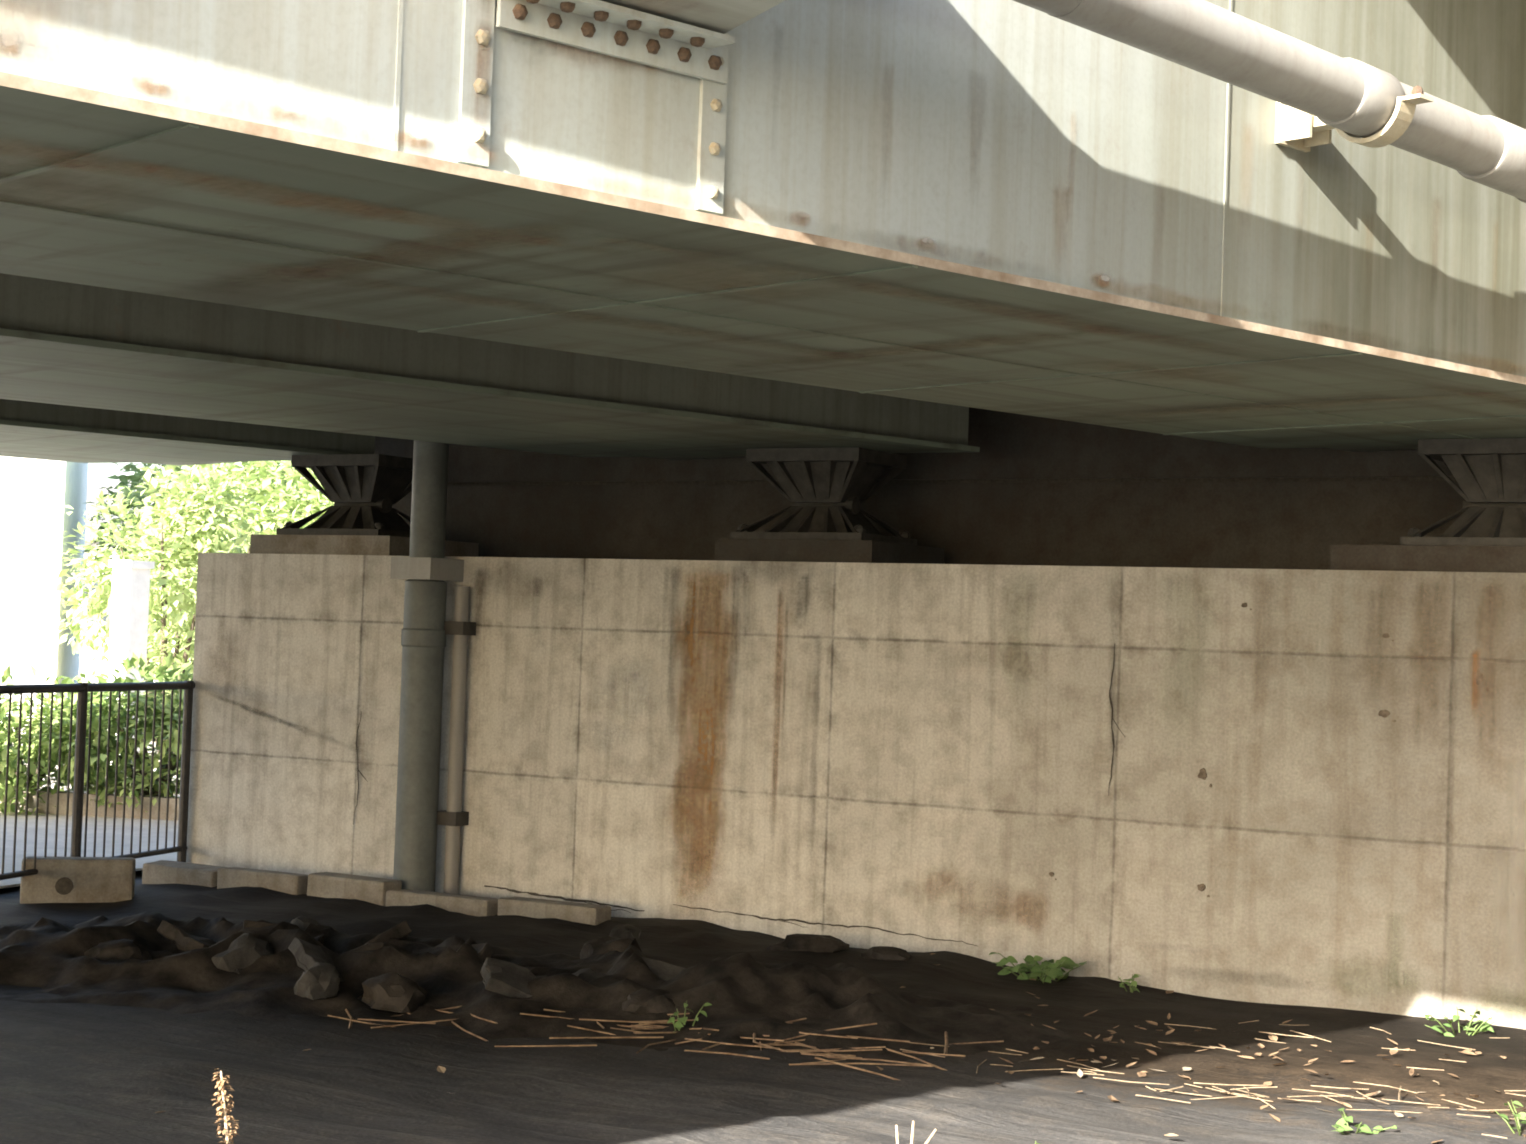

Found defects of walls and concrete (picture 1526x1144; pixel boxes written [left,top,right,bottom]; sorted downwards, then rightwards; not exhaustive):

rust [681,581,725,854]